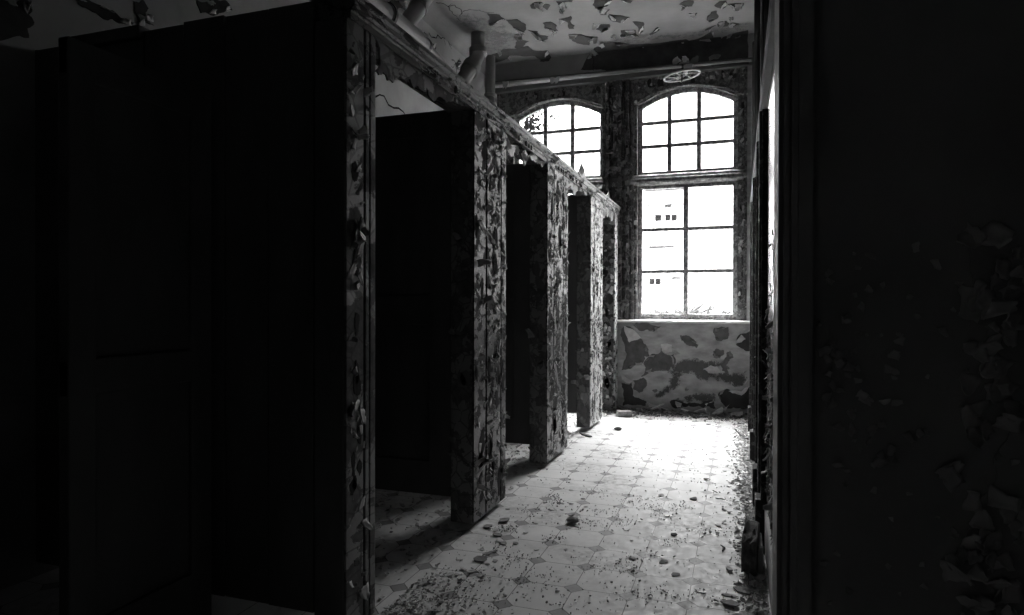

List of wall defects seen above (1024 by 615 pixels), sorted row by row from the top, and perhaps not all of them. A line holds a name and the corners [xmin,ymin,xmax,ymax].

flaking render [76,0,154,26]
flaking render [196,0,232,16]
peeling [346,41,373,290]
peeling [416,0,774,544]
peeling [348,360,374,531]
peeling [348,560,370,601]